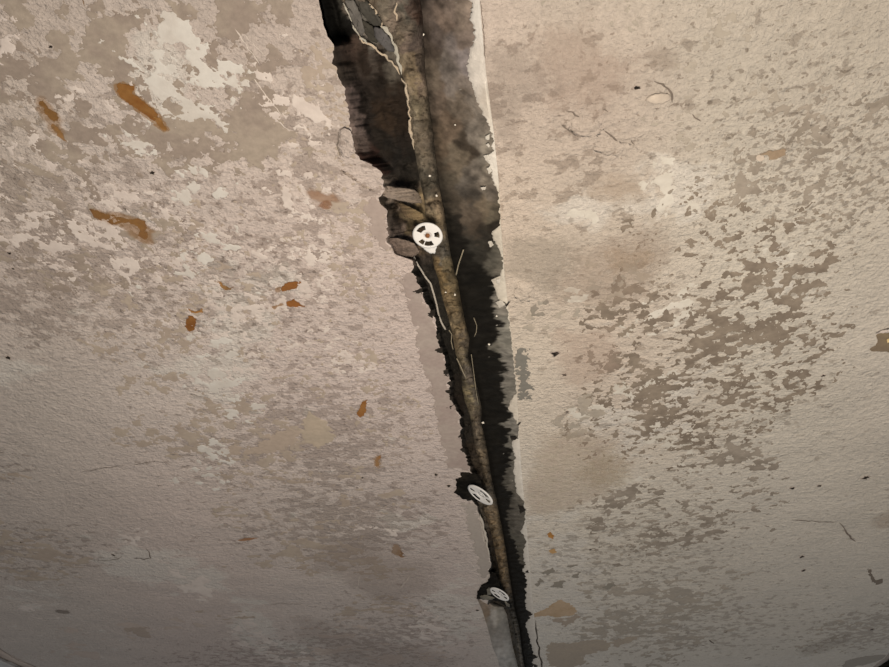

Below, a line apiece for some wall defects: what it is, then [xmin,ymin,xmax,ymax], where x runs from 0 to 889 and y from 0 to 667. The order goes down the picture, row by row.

corrosion [39,101,67,142]
corrosion [117,83,167,131]
corrosion [90,209,148,240]
corrosion [272,281,305,309]
corrosion [185,309,203,332]
peeling [0,0,521,667]
peeling [466,0,889,667]